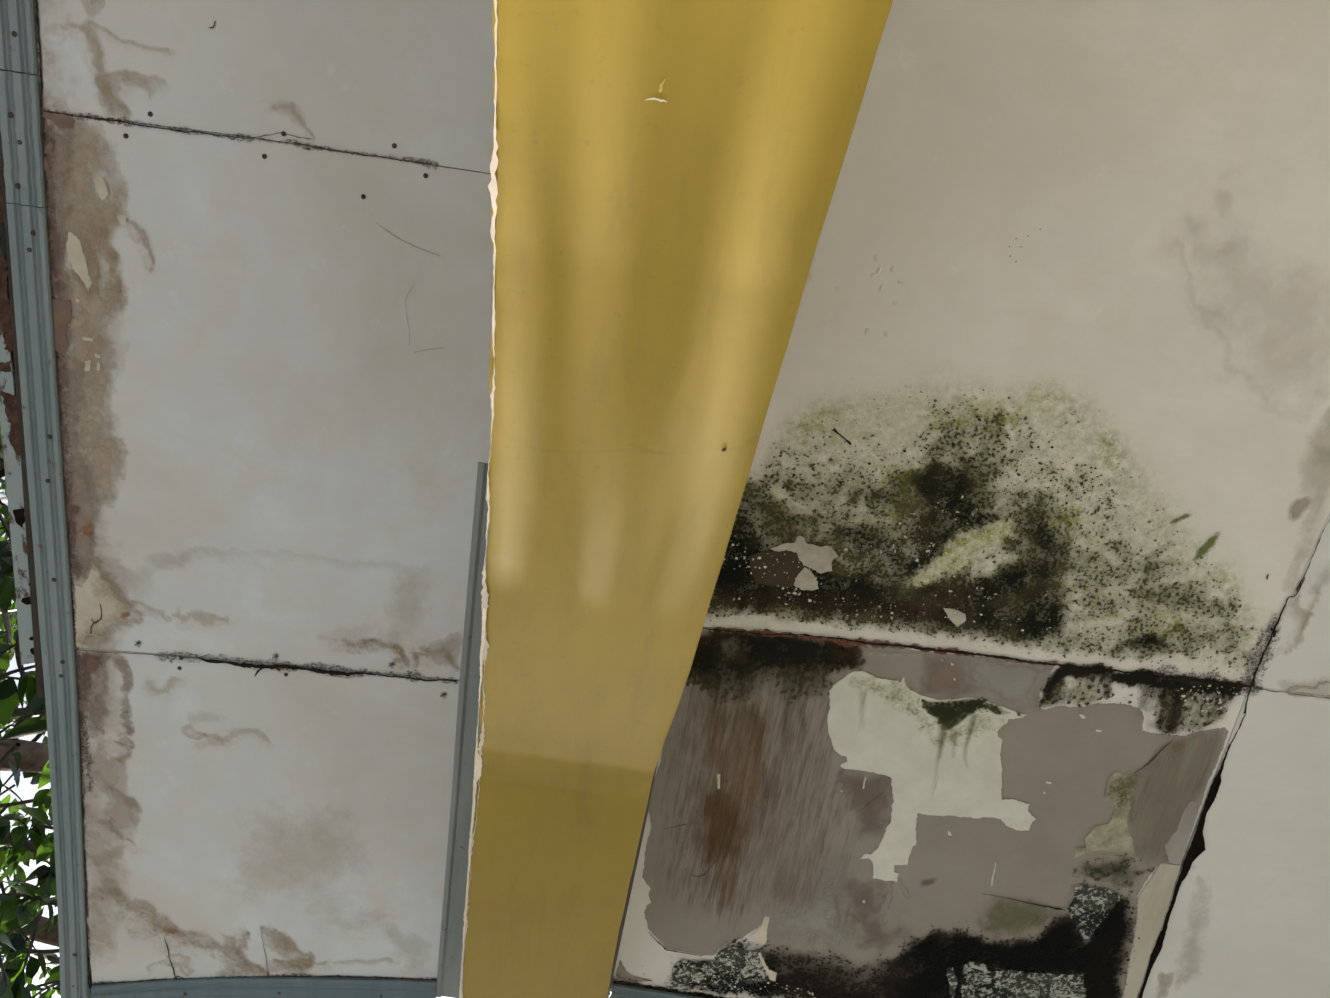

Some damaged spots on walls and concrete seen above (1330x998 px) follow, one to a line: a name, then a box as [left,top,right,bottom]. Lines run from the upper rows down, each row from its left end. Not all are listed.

corrosion [0,248,13,372]
corrosion [0,390,20,456]
corrosion [13,508,25,528]
water stain [35,17,438,588]
water stain [75,634,458,867]
peeling [642,644,1229,998]
water stain [667,389,1263,998]
crack [1139,519,1330,998]
peeling [1286,681,1330,699]
peeling [615,960,651,982]